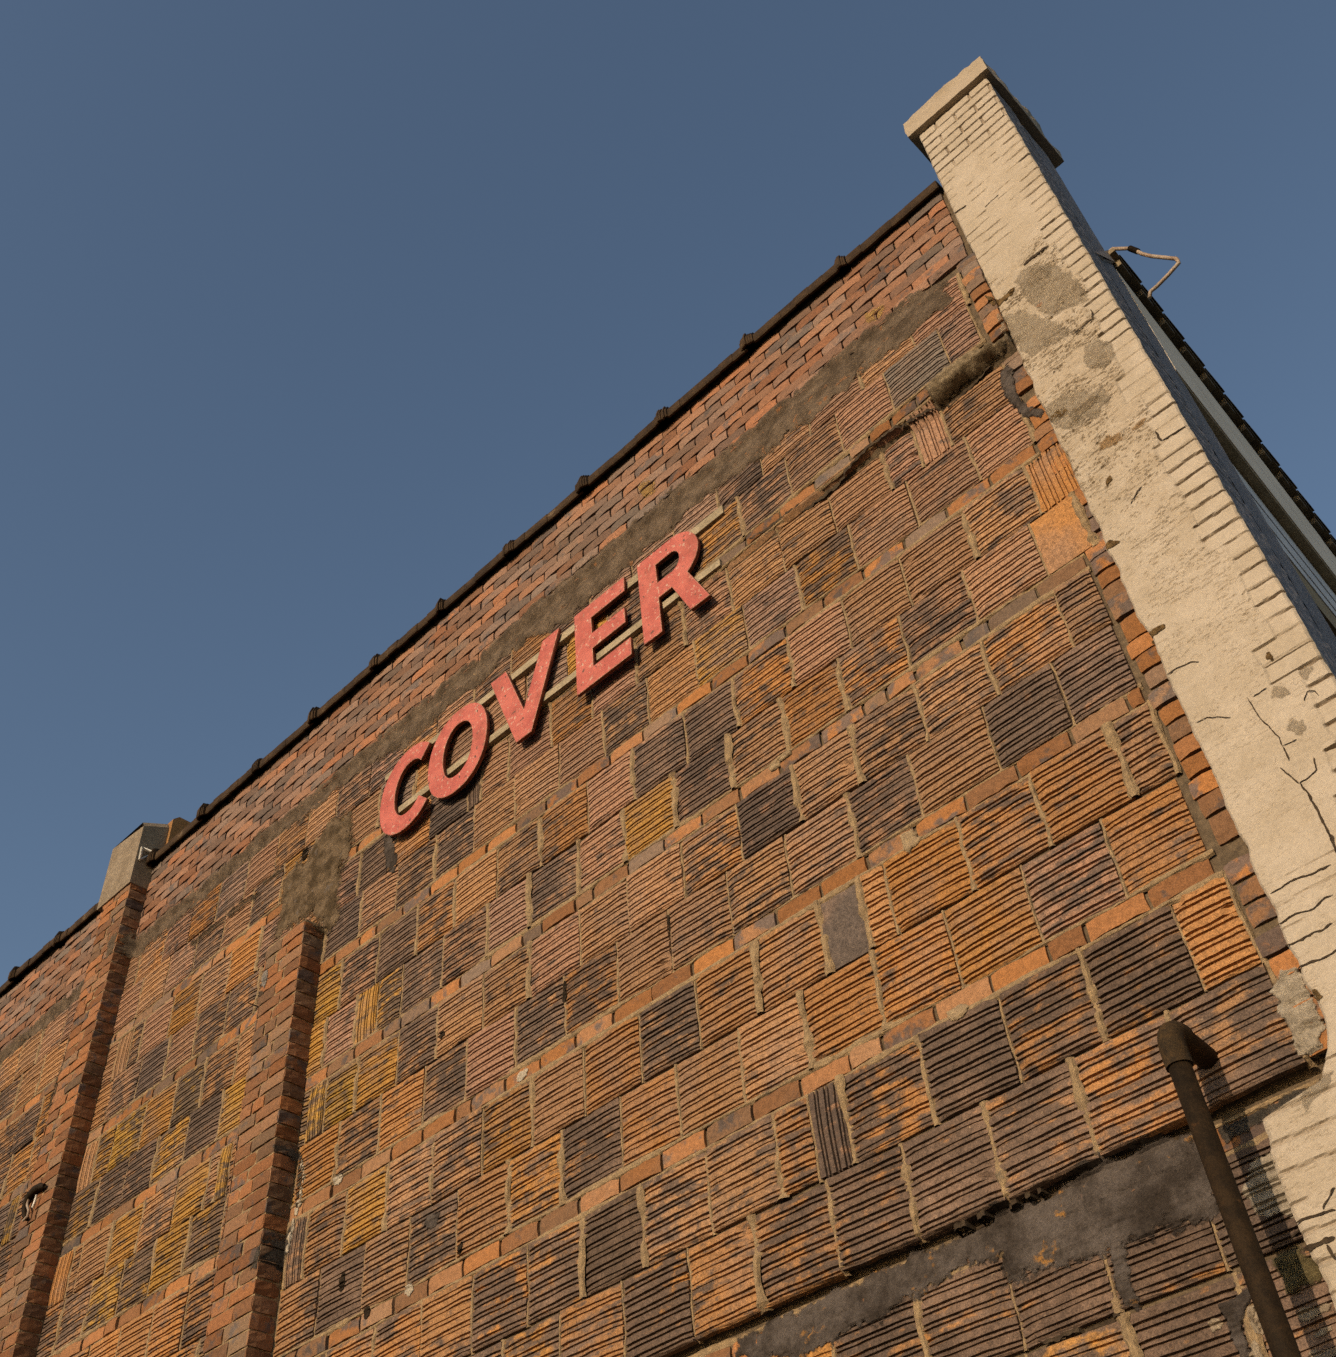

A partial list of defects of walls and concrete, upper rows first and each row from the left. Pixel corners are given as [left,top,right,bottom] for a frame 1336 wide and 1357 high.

crack [1198,688,1336,970]